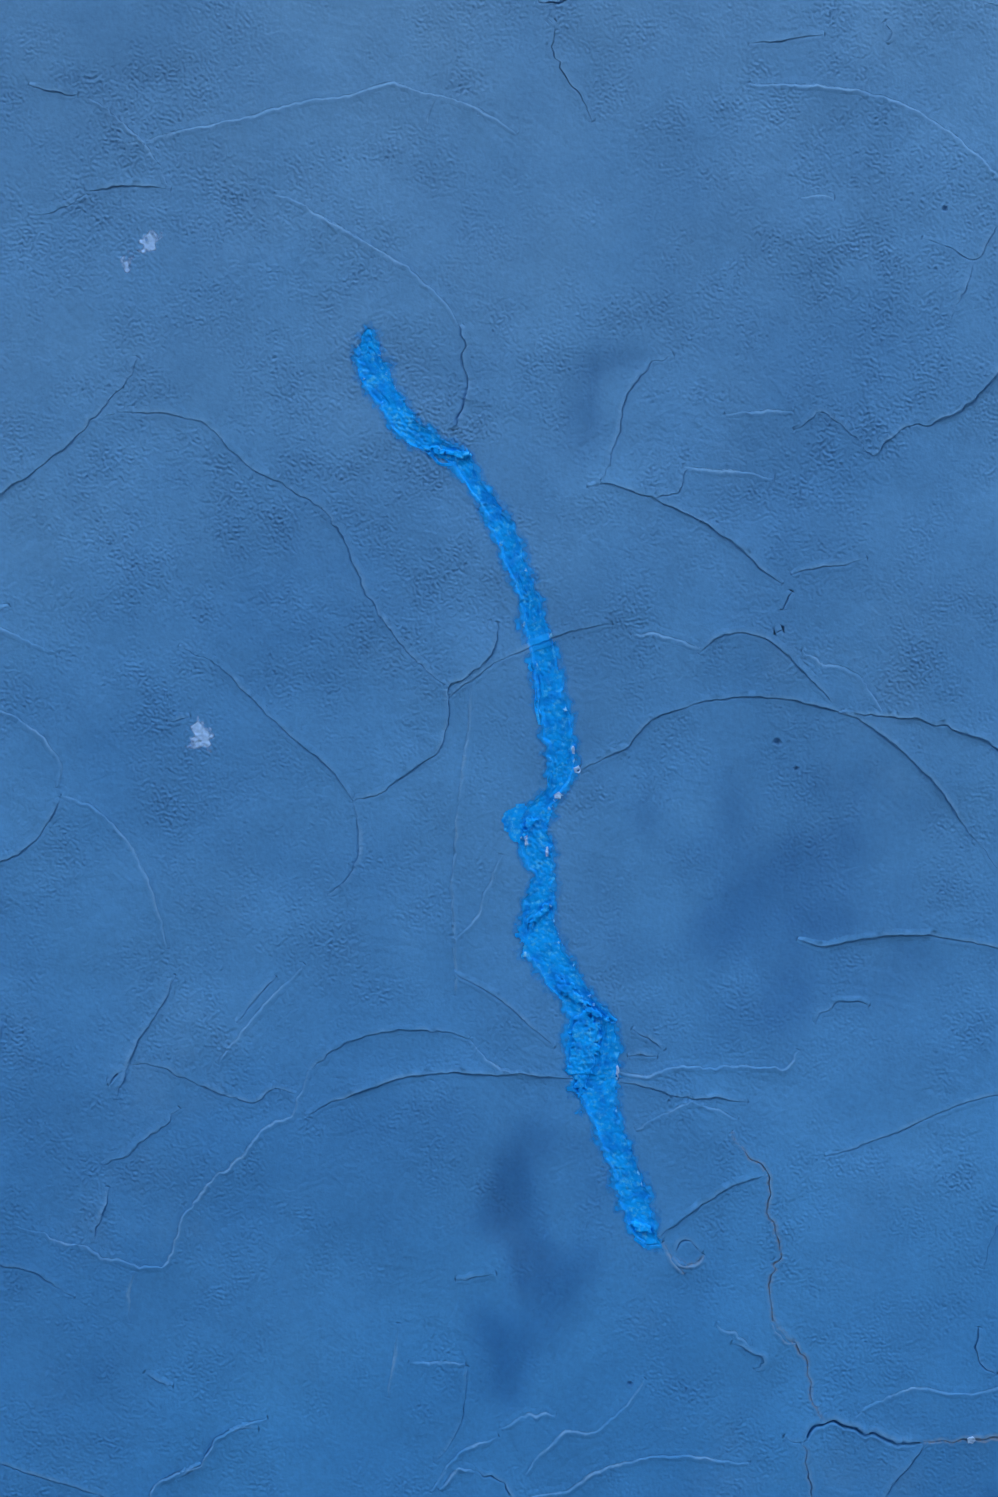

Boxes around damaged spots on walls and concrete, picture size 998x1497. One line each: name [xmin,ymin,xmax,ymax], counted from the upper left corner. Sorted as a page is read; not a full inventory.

crack [530,0,595,122]
crack [351,326,998,1497]